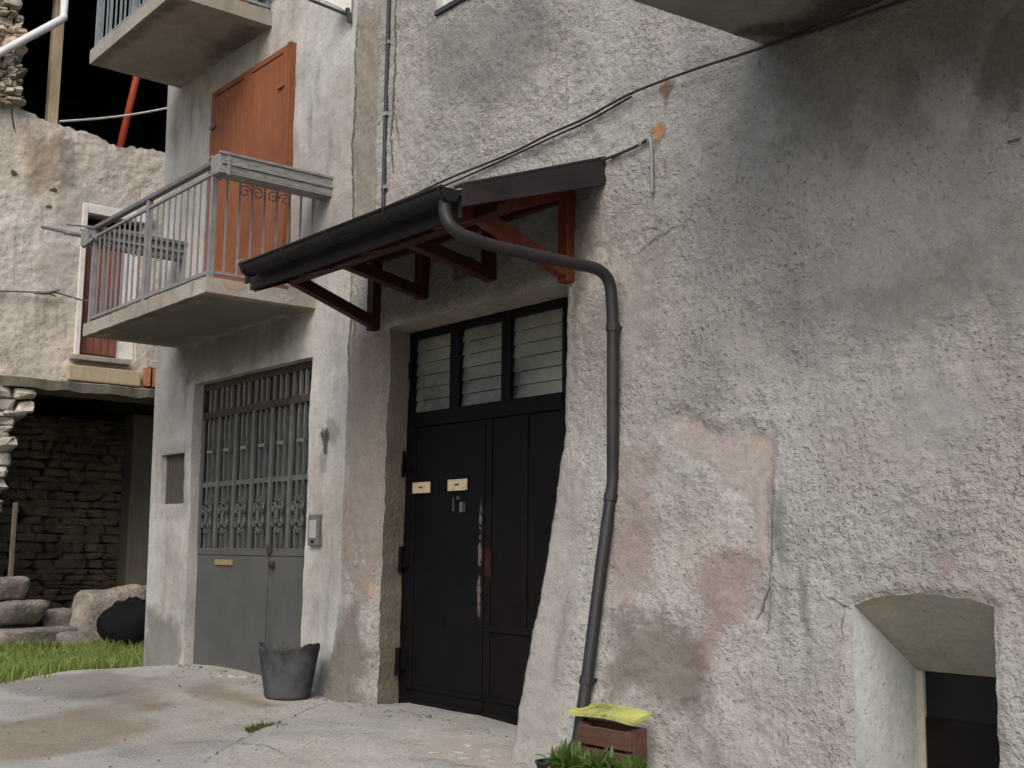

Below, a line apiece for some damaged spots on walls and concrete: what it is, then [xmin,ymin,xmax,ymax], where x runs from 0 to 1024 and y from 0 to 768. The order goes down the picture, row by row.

rust [650,122,665,141]
crack [631,217,690,255]
crack [756,465,775,634]